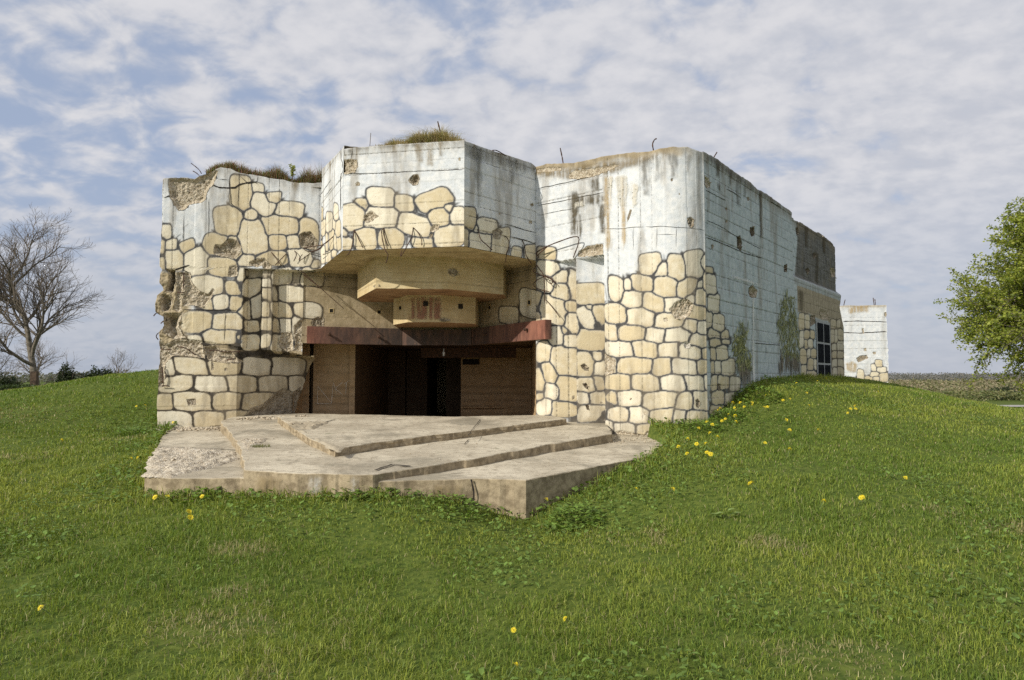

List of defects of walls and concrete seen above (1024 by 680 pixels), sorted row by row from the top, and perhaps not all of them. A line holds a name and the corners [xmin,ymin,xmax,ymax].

spalling [168,170,218,211]
leakage [538,157,650,234]
spalling [213,238,272,277]
spalling [578,244,603,257]
spalling [159,269,243,387]
spalling [663,299,693,322]